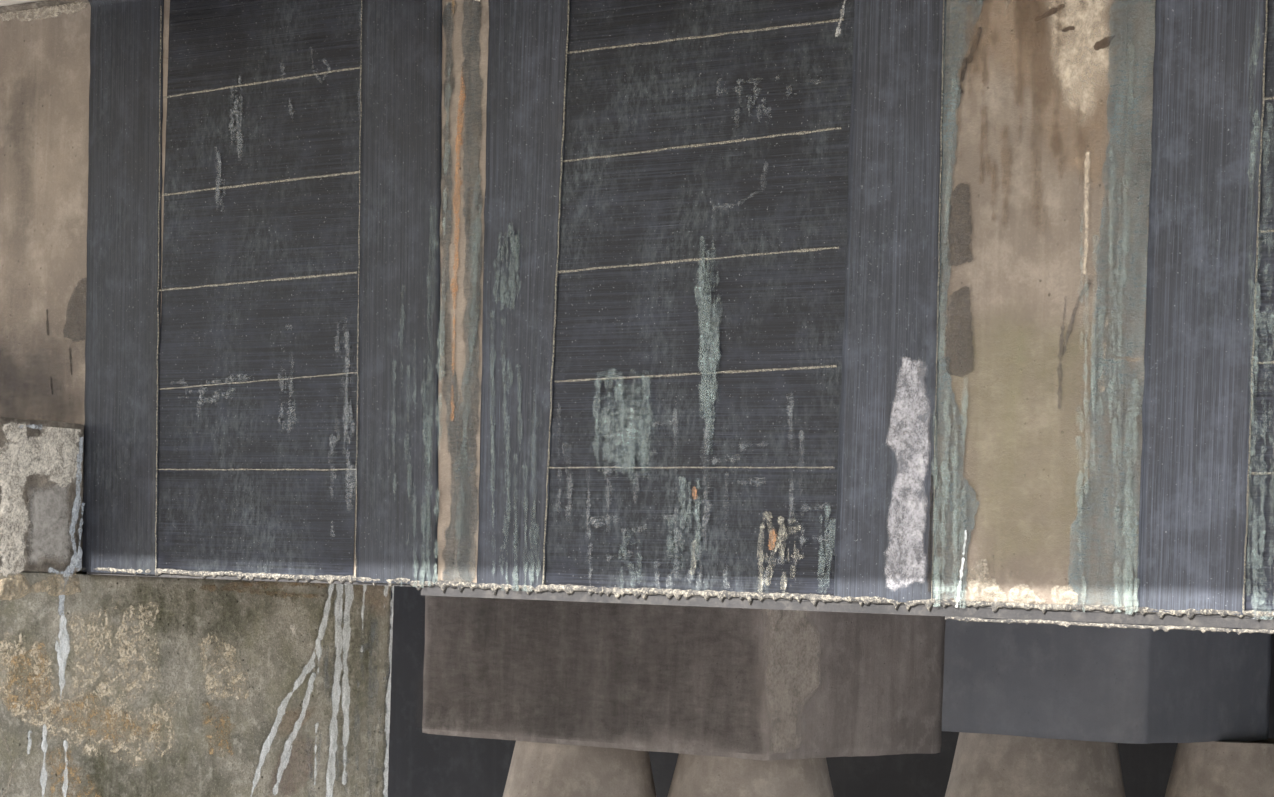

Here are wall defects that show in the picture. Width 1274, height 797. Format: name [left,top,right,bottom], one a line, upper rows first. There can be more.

rust [451,75,466,420]
water stain [413,0,521,582]
water stain [932,0,994,608]
water stain [1016,0,1155,612]
peeling [0,423,81,601]
water stain [27,726,48,796]
water stain [251,584,375,797]
water stain [383,586,394,797]